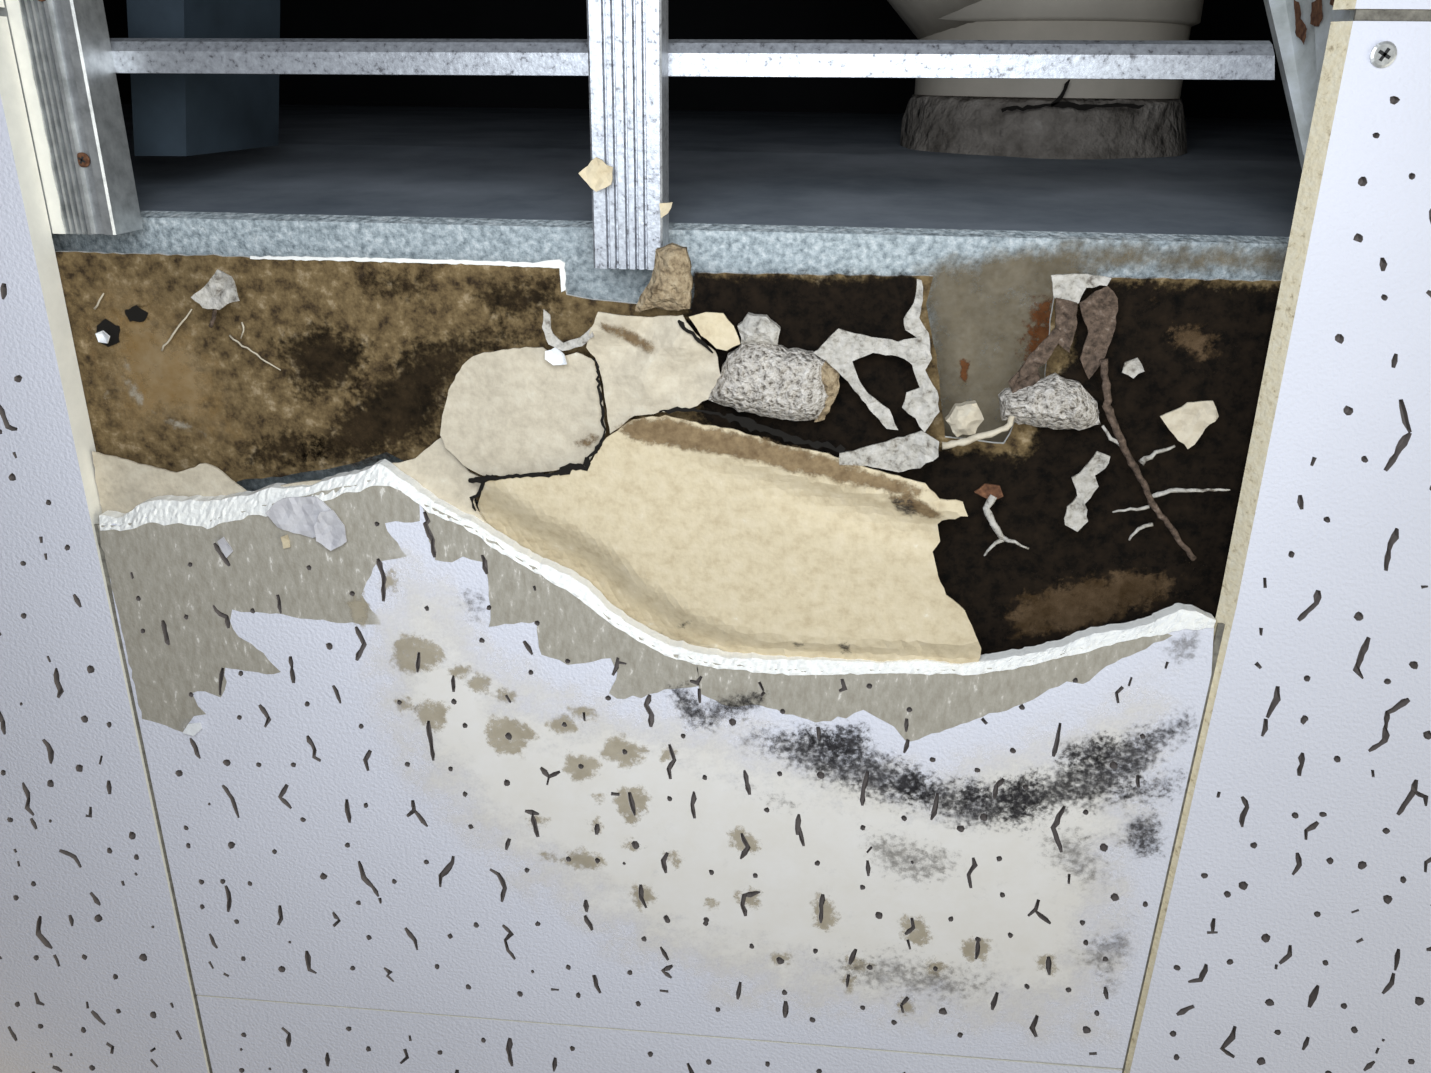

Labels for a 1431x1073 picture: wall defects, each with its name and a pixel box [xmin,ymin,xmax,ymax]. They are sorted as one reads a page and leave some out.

rust [1294,0,1334,44]
leakage [84,296,219,427]
leakage [359,271,428,296]
leakage [247,275,559,472]
spalling [250,255,566,292]
crack [468,358,606,511]
leakage [601,323,653,352]
crack [677,320,713,353]
leakage [621,248,1286,655]
peeling [98,459,1216,742]
leakage [347,569,1189,1036]